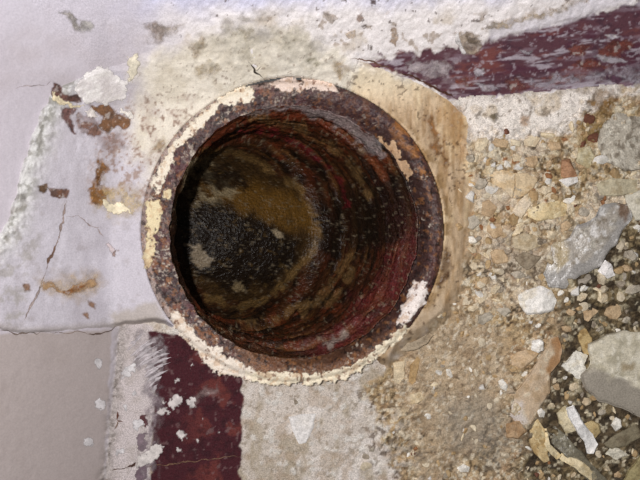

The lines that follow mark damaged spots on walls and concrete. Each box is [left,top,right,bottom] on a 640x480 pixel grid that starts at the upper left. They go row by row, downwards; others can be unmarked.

spalling [487,9,557,29]
spalling [455,32,481,54]
flaking render [51,83,133,140]
corrosion [428,116,442,153]
flaking render [39,184,69,198]
corrosion [89,160,109,206]
spalling [559,177,578,187]
crack [1,200,115,335]
spalling [598,260,615,278]
corrosion [43,279,97,295]
peeling [136,415,148,451]
peeling [135,465,147,480]